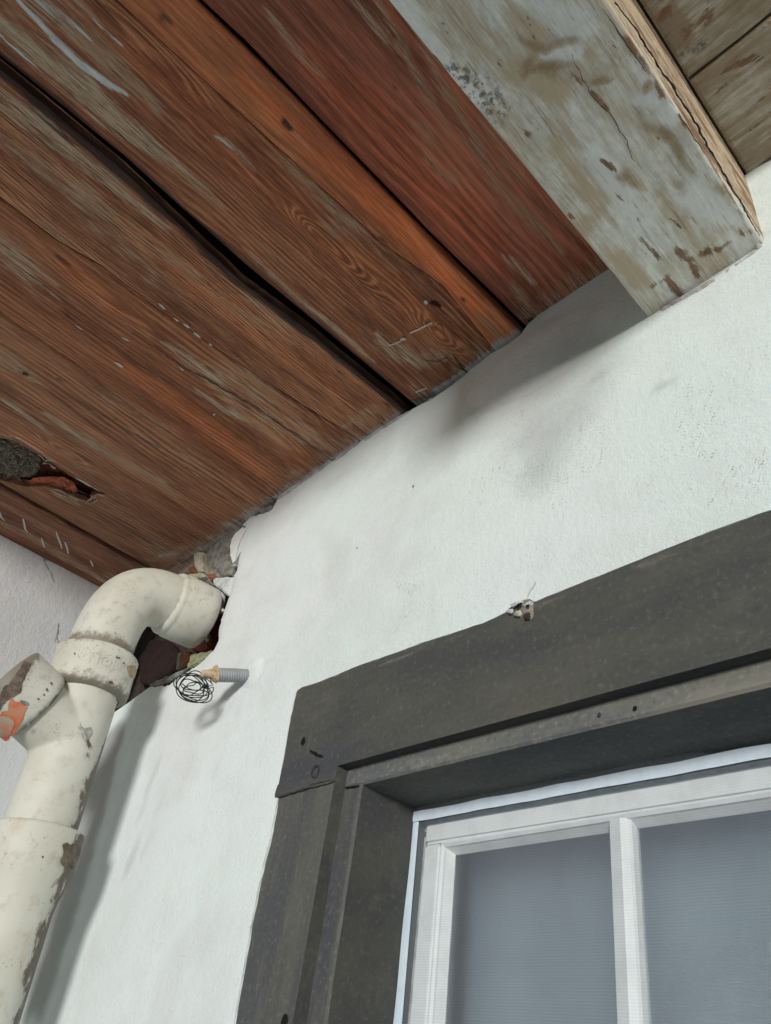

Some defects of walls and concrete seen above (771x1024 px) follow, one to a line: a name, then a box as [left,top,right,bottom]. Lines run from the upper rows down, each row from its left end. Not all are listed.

crack [572,54,633,160]
crack [602,2,760,236]
flaking render [139,527,245,687]
flaking render [507,600,534,619]